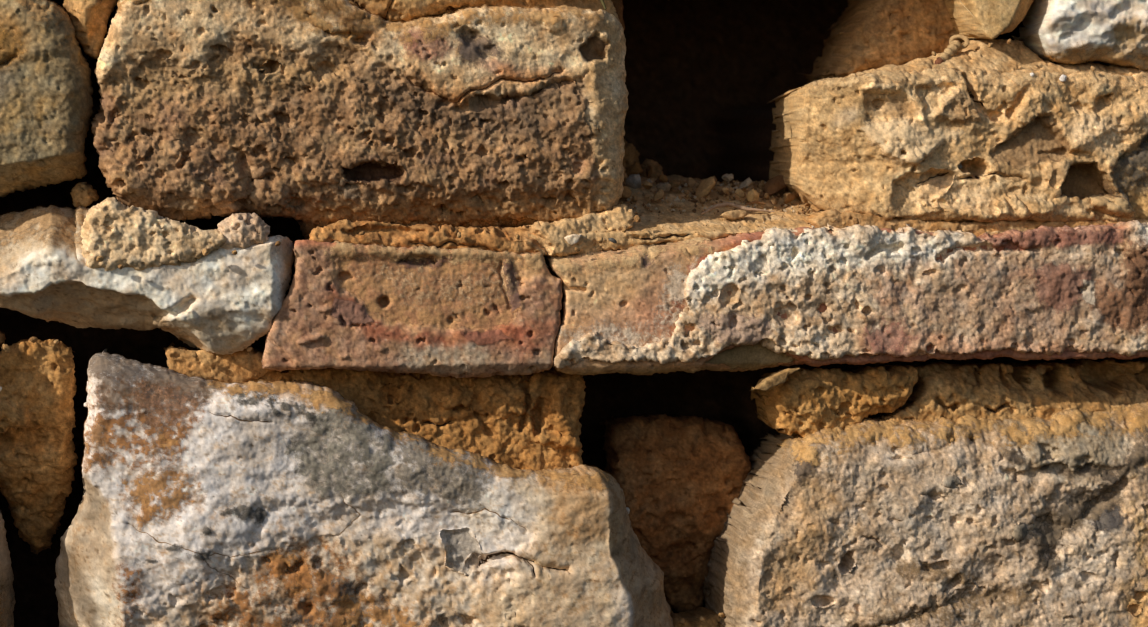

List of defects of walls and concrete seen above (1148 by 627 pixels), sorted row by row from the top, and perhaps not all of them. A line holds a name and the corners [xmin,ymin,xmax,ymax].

crack [416,72,560,103]
crack [452,508,555,575]